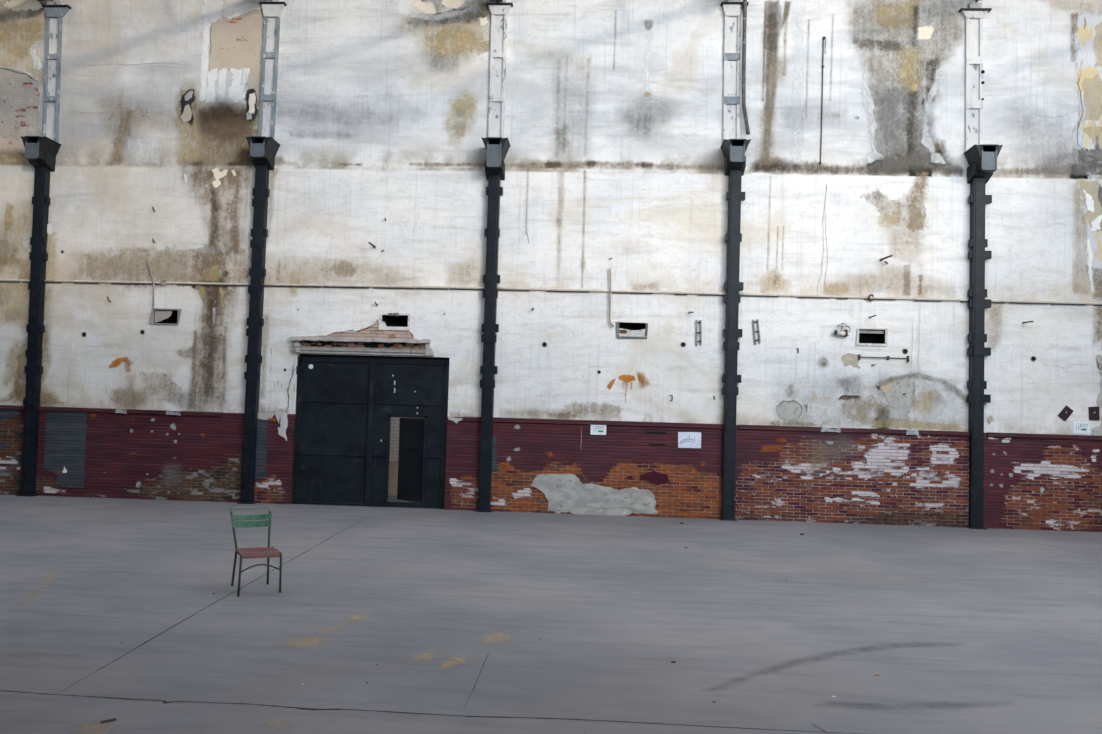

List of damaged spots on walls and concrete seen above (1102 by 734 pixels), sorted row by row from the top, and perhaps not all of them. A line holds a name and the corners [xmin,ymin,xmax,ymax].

spalling [0,66,40,155]
damp [854,0,961,243]
peeling [1071,8,1102,340]
corrosion [109,357,133,371]
corrosion [607,373,647,396]
peeling [1091,355,1102,436]
peeling [0,418,24,495]
peeling [449,427,969,527]
peeling [988,437,1102,531]